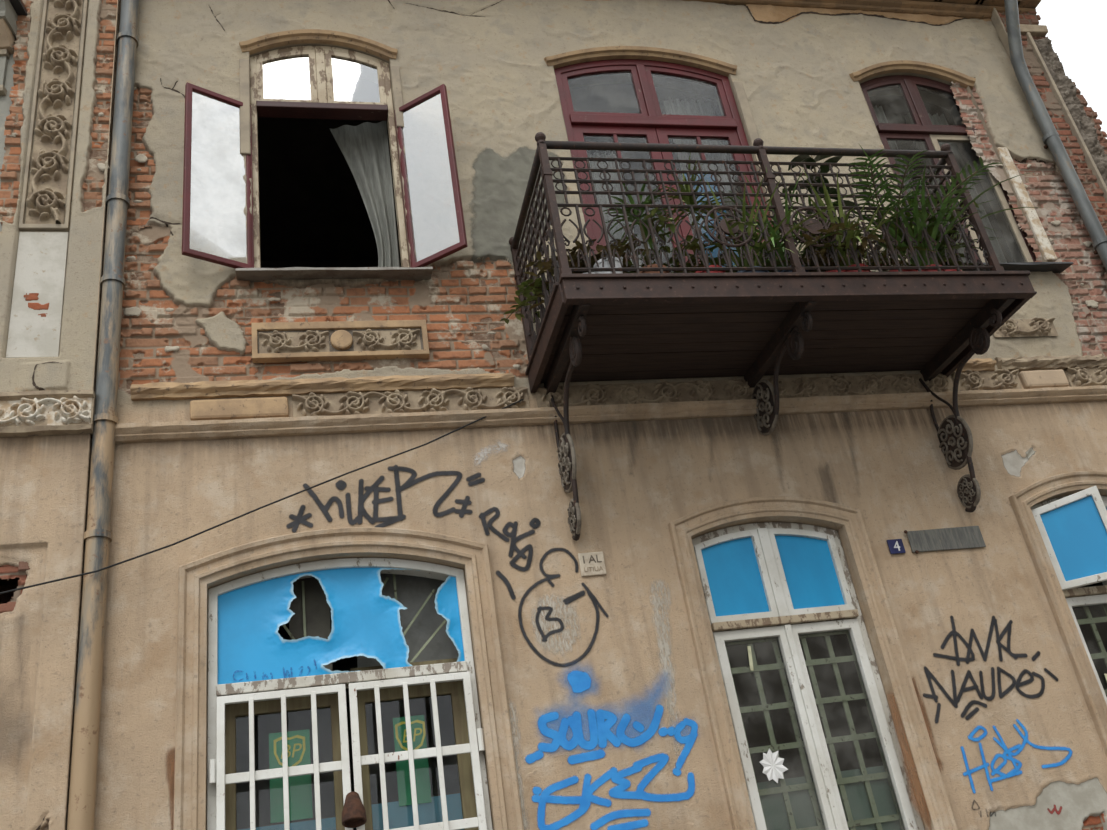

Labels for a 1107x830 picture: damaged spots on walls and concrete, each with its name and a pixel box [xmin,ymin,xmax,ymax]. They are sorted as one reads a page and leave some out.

flaking render [24,293,49,317]
flaking render [119,87,529,391]
flaking render [950,81,1107,357]
flaking render [1019,11,1107,236]
spalling [0,561,30,613]
flaking render [989,778,1107,830]